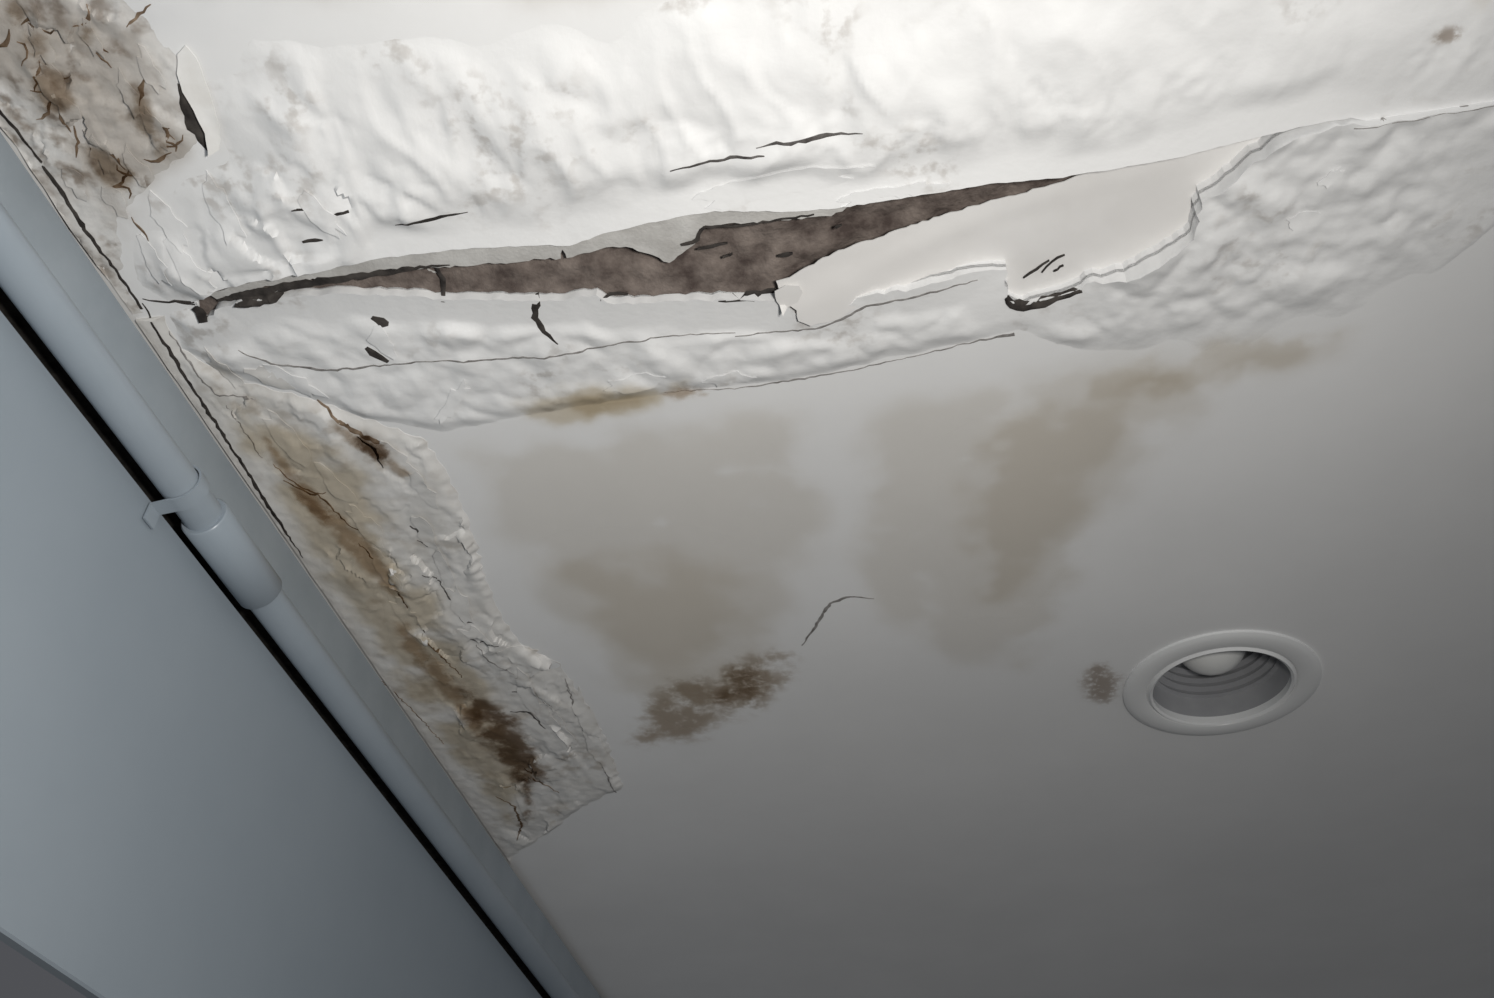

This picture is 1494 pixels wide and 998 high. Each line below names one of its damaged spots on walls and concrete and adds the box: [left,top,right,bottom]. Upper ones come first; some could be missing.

crack [1354,105,1494,129]
flaking render [294,174,1080,301]
crack [1023,254,1065,278]
damp [473,700,543,790]